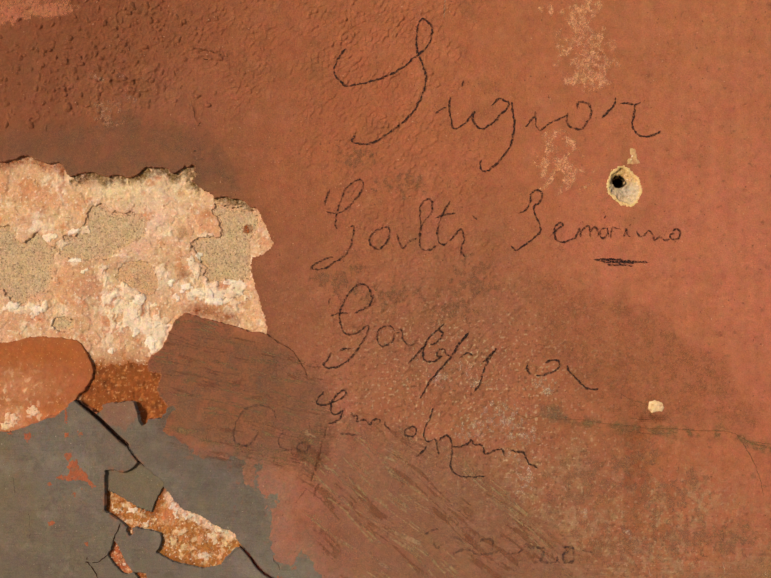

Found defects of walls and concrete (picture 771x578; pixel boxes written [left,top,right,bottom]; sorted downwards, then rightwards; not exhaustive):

peeling [0,156,322,578]
crack [76,399,144,466]
crack [577,395,771,496]
crack [86,524,120,577]
crack [239,544,279,578]